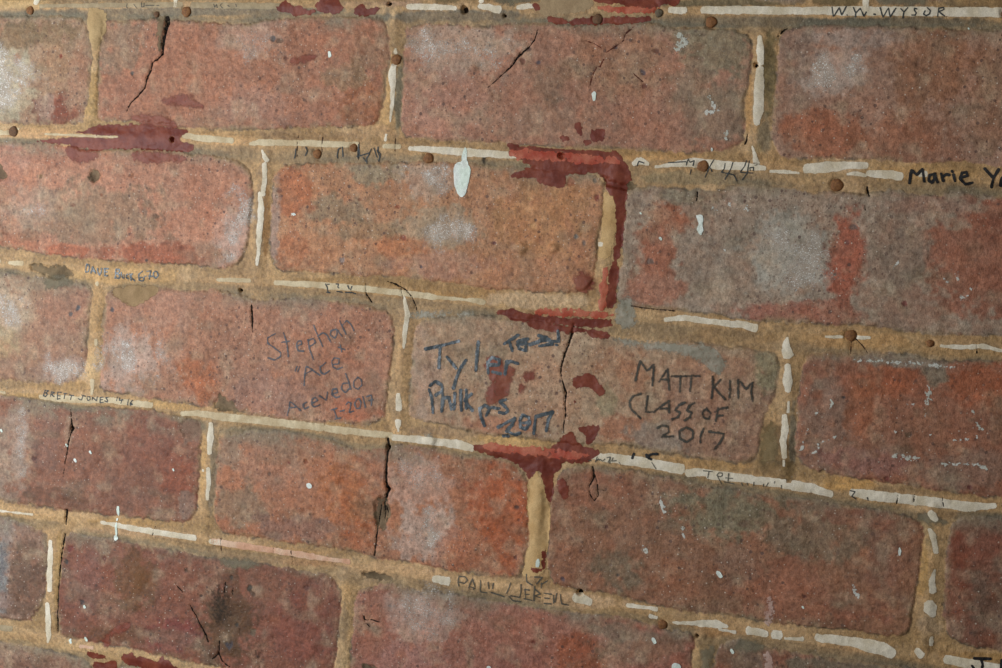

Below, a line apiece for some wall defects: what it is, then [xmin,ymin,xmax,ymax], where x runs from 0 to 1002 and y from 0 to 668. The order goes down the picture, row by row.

crack [127,16,170,110]
crack [488,30,538,87]
crack [560,326,575,433]
crack [63,409,75,474]
crack [374,438,391,556]
crack [57,509,68,633]